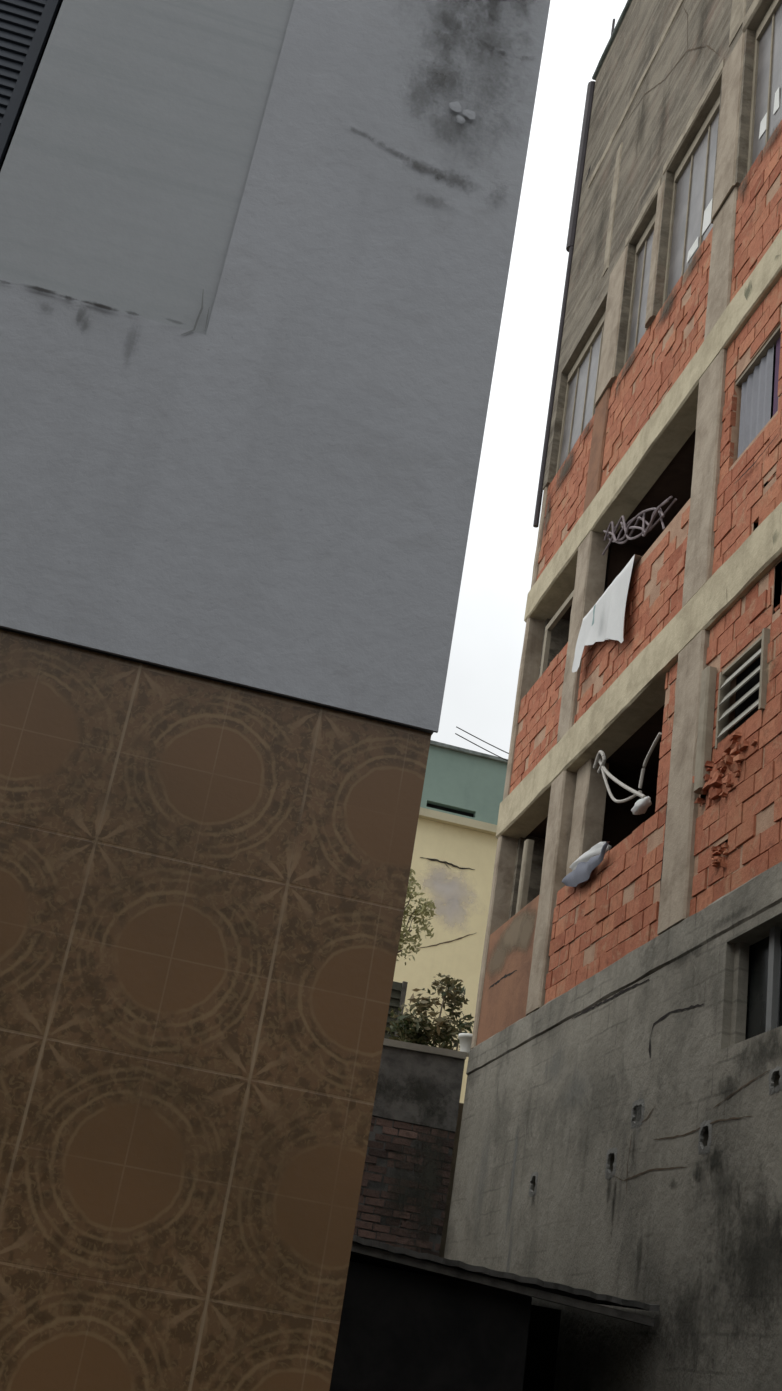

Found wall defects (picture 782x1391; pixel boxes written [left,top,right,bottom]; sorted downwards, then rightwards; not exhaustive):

crack [412,857,475,883]
crack [572,979,649,1019]
crack [649,1003,704,1058]